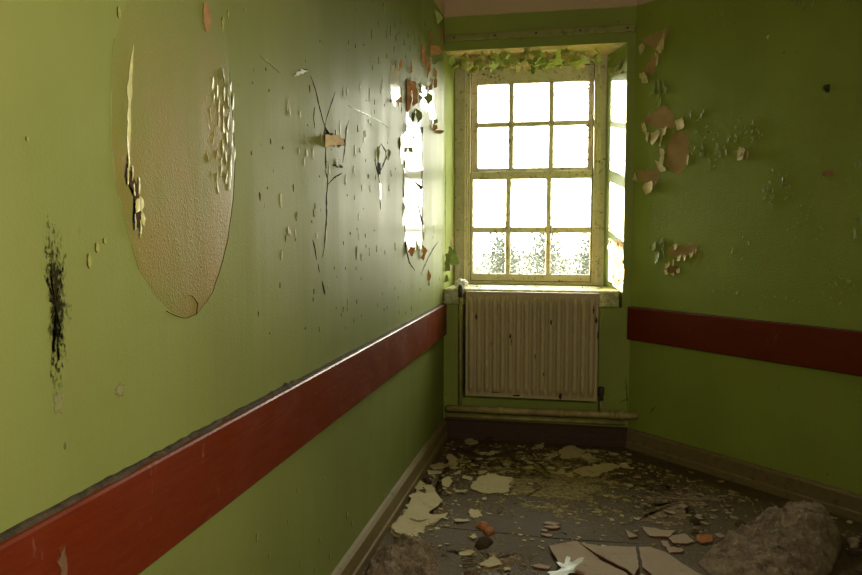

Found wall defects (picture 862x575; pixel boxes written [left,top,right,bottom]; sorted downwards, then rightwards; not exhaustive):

peeling [361,8,624,291]
peeling [632,25,690,195]
peeling [736,147,749,161]
water stain [46,216,70,387]
peeling [649,238,700,277]